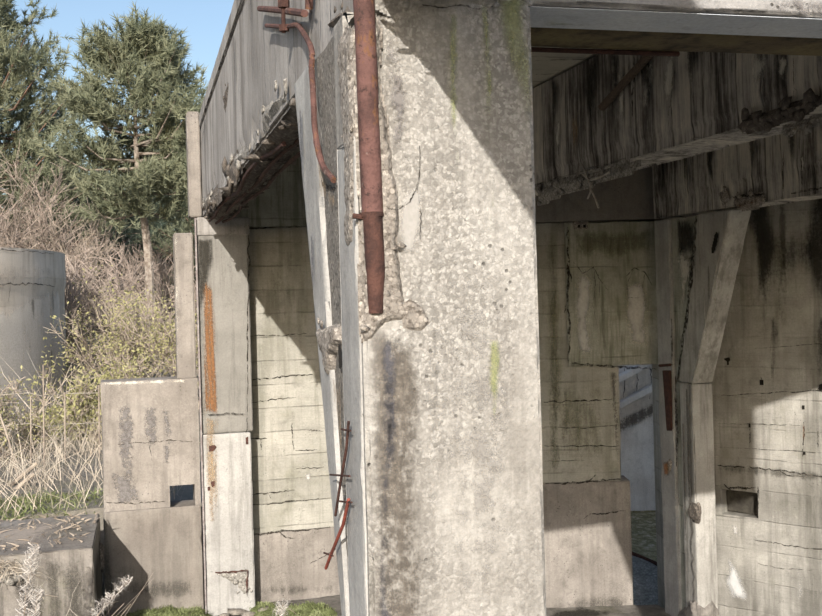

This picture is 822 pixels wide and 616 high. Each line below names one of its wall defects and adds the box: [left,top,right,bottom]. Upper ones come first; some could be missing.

spalling [201,78,301,224]
spalling [328,0,533,343]
spalling [739,88,822,138]
water stain [752,198,822,285]
rust [204,284,217,520]
crack [203,226,313,450]
crack [252,490,325,505]
water stain [376,338,418,616]
crack [544,425,620,485]
crack [544,227,652,403]
spalling [217,569,253,594]
spalling [677,600,719,616]